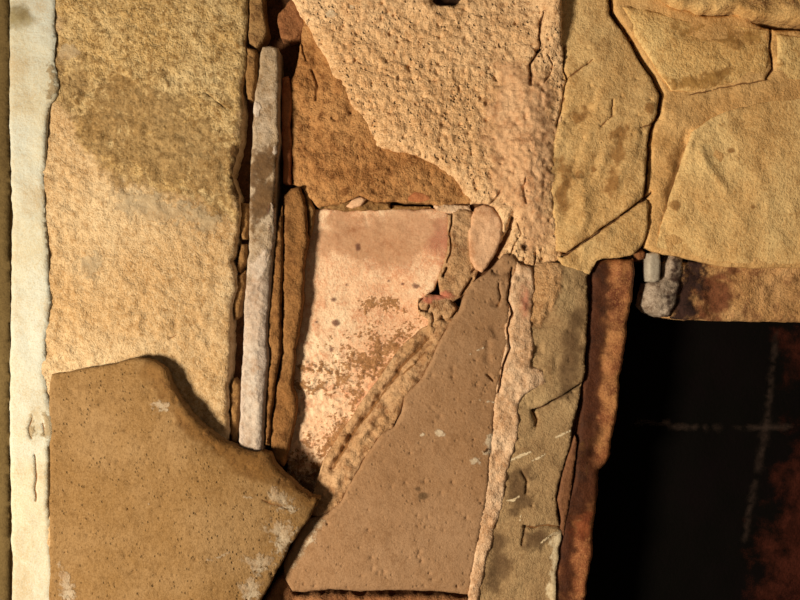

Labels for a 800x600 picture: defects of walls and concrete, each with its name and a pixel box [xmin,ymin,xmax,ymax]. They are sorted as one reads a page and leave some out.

water stain [55,0,277,234]
spalling [291,19,503,272]
crack [529,10,593,127]
crack [561,28,662,257]
water stain [142,361,318,600]